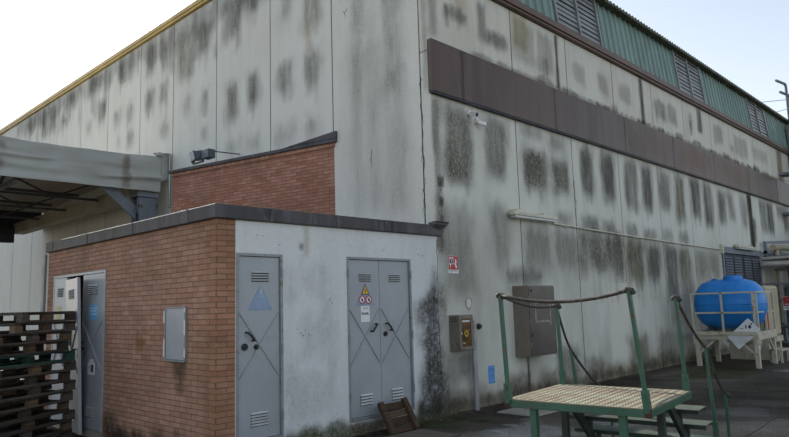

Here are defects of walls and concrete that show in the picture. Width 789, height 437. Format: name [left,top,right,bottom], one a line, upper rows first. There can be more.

crack [418,76,426,220]
damp [446,107,472,181]
damp [523,150,569,189]
damp [581,149,593,192]
damp [602,156,614,197]
damp [626,164,668,208]
damp [677,180,724,224]
damp [746,195,782,247]
damp [580,222,688,294]
damp [419,288,469,427]